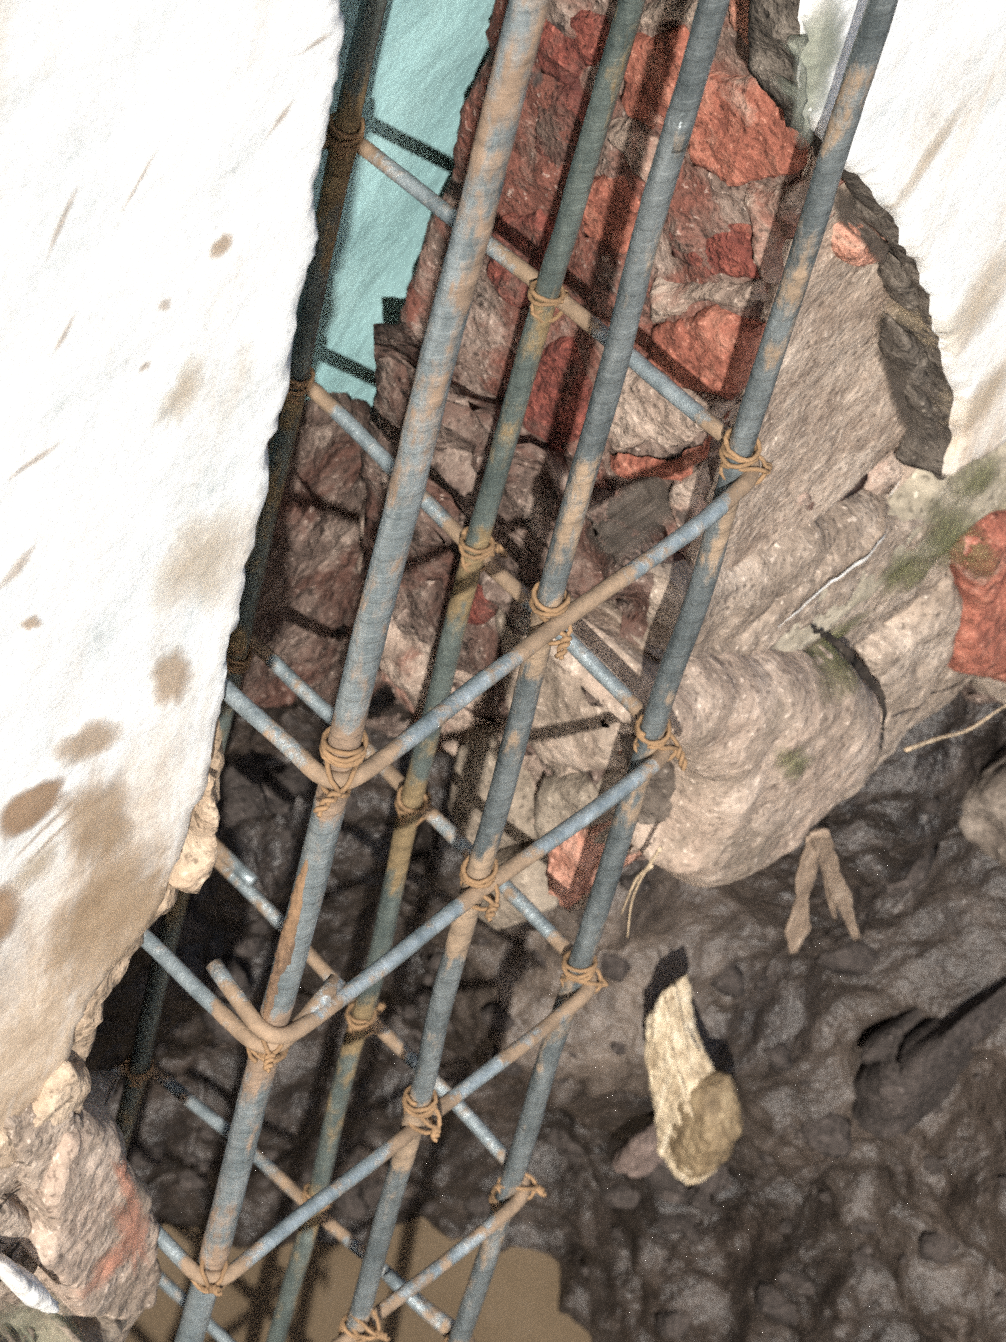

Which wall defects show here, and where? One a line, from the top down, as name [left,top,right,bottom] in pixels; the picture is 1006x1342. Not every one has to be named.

flaking render [688,70,811,187]
leakage [213,237,230,255]
flaking render [492,208,554,272]
flaking render [647,304,766,420]
leakage [157,656,186,699]
crack [811,625,887,754]
leakage [63,725,111,758]
leakage [1,781,61,837]
flaking render [168,772,220,894]
rust [263,859,308,1021]
flaking render [32,1058,92,1128]
crack [0,1188,21,1282]